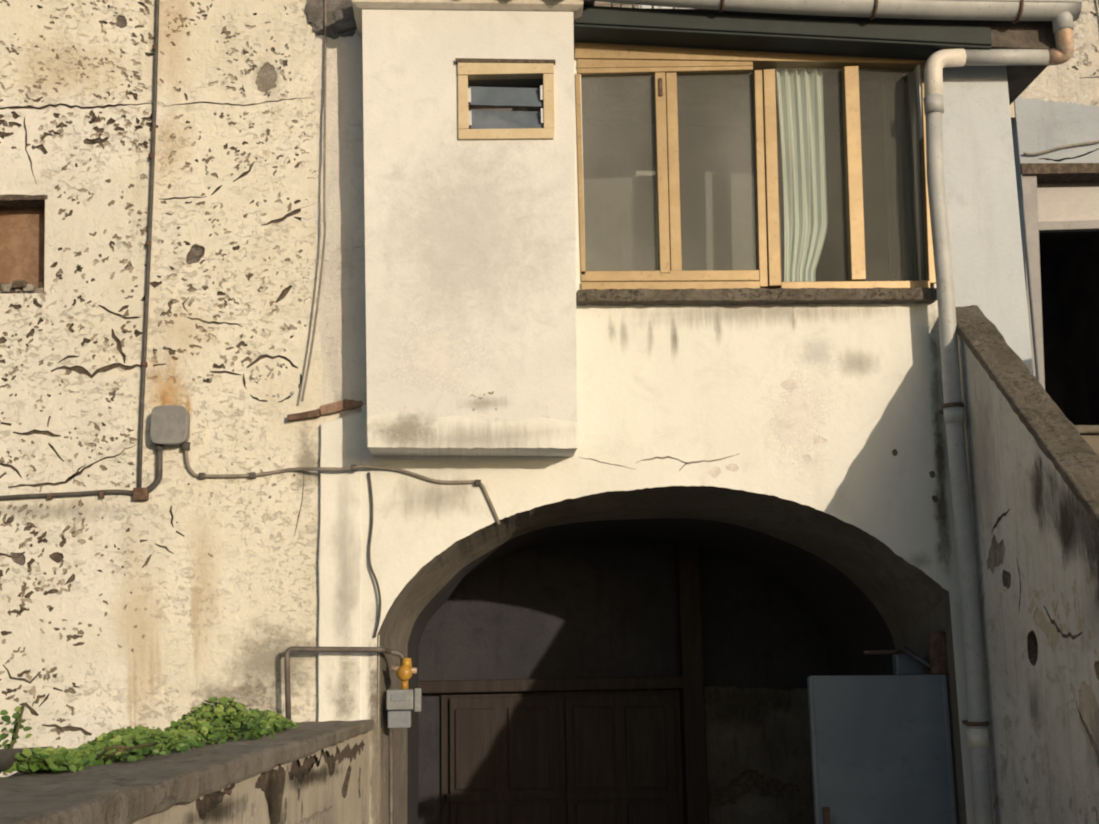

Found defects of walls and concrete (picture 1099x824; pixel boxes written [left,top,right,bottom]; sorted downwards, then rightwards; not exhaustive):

crack [0,96,315,184]
crack [161,162,254,200]
crack [263,203,315,225]
crack [182,297,243,327]
crack [275,285,292,303]
crack [51,305,165,379]
crack [210,354,302,402]
crack [0,416,137,488]
crack [580,454,738,471]
leakage [1034,463,1099,583]
peeling [987,535,1011,589]
crack [1017,561,1083,640]